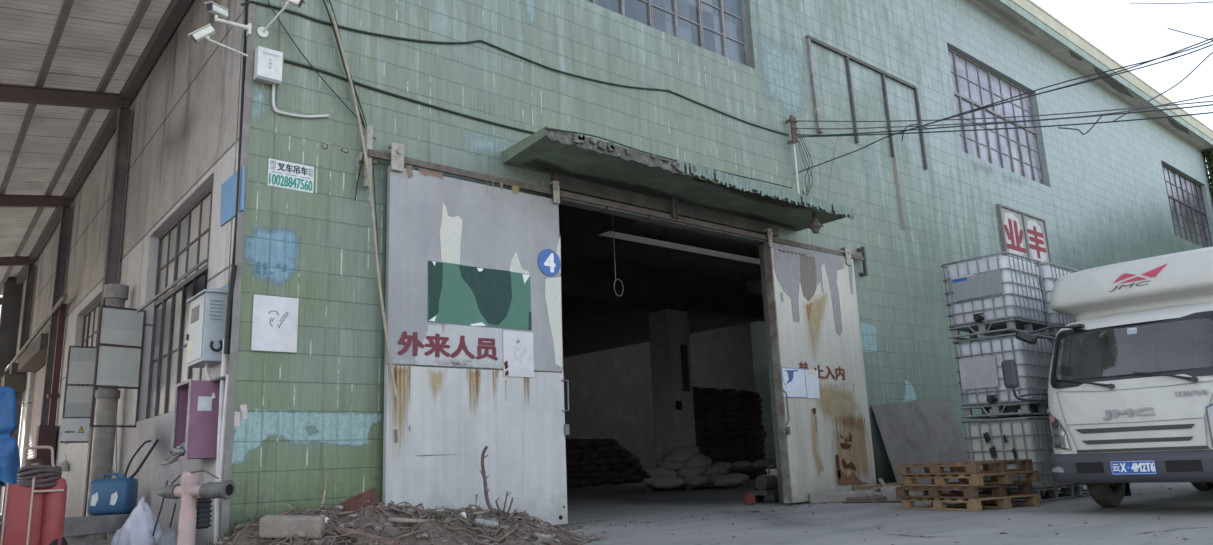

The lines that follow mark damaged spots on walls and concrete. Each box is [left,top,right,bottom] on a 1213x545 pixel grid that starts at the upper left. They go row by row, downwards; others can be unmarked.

peeling [440,202,463,264]
rust [388,366,410,425]
rust [432,363,494,399]
rust [812,384,869,486]